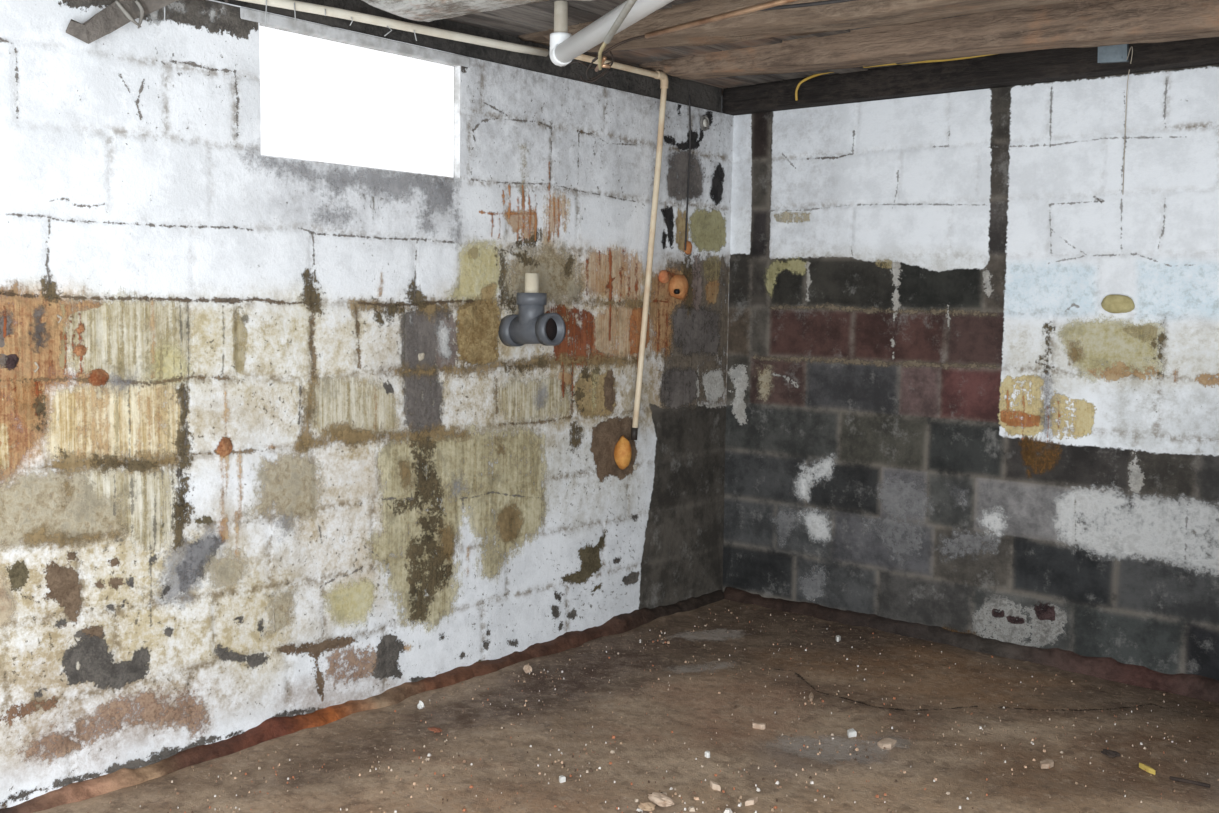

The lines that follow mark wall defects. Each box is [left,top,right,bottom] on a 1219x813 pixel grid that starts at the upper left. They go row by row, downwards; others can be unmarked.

water stain [249,154,314,191]
rust [479,148,570,246]
rust [0,281,112,483]
water stain [246,448,321,528]
water stain [299,169,617,632]
peeling [569,416,638,483]
rust [998,374,1097,478]
water stain [265,592,295,635]
peeling [550,529,640,631]
spalling [0,550,245,809]
peeling [214,634,425,718]
crack [776,669,1169,711]